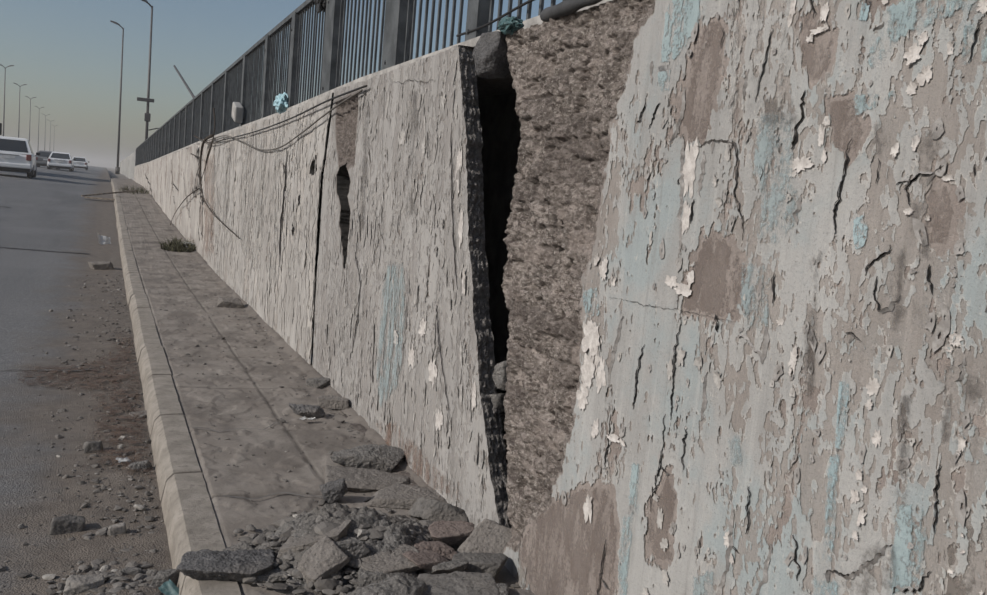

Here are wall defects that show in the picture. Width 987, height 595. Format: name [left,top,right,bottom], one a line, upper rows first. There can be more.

peeling [787,0,832,78]
peeling [903,30,932,96]
crack [266,140,289,267]
crack [309,100,332,359]
crack [435,305,452,426]
crack [450,123,458,290]
crack [475,70,522,464]
spalling [501,0,655,595]
peeling [788,80,893,178]
crack [832,138,853,239]
peeling [921,303,963,352]
peeling [932,489,984,595]